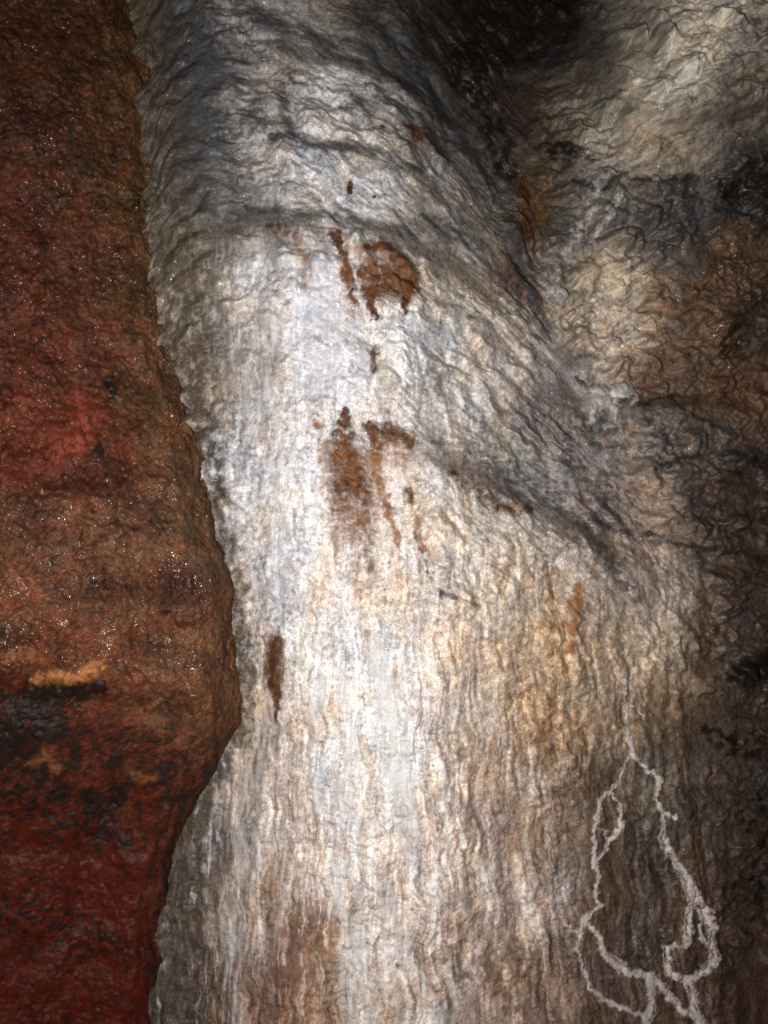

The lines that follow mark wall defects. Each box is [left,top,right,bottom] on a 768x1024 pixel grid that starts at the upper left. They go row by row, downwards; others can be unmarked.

corrosion [328,228,420,321]
corrosion [370,345,380,373]
corrosion [313,407,418,548]
corrosion [404,487,427,552]
corrosion [265,634,283,721]